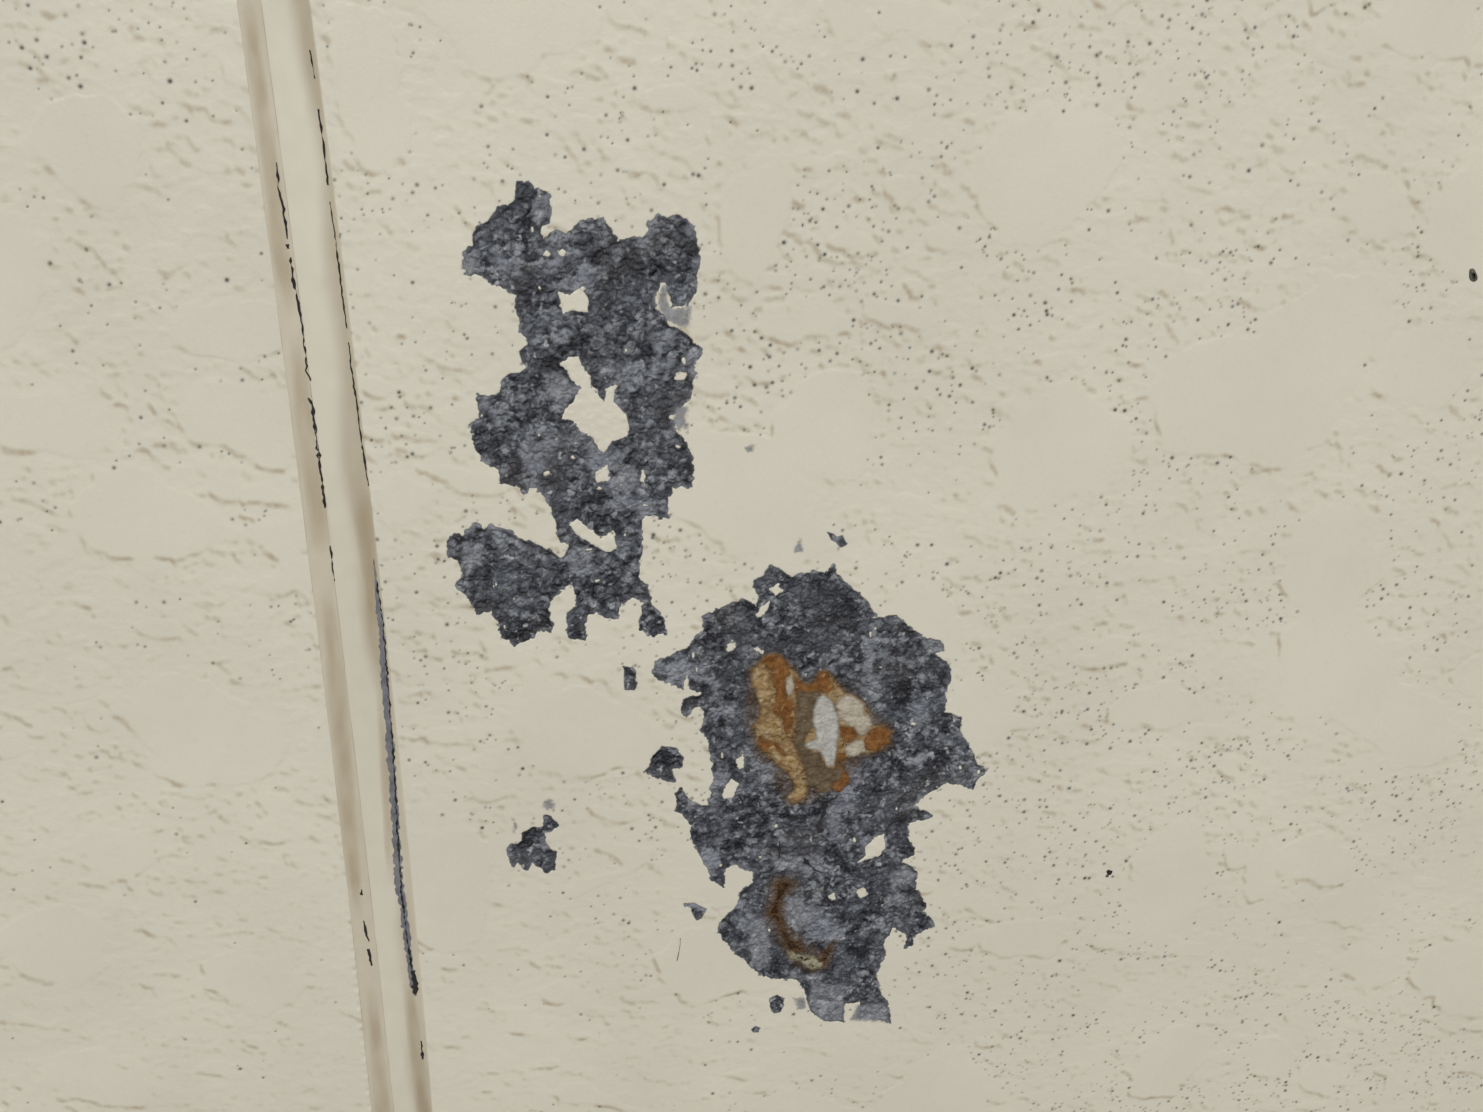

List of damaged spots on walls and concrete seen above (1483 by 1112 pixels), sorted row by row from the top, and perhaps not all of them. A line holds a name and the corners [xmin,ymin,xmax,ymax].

peeling [447,181,703,647]
corrosion [758,655,833,755]
peeling [622,532,987,1023]
corrosion [831,726,890,792]
peeling [507,800,559,873]
corrosion [768,880,832,970]